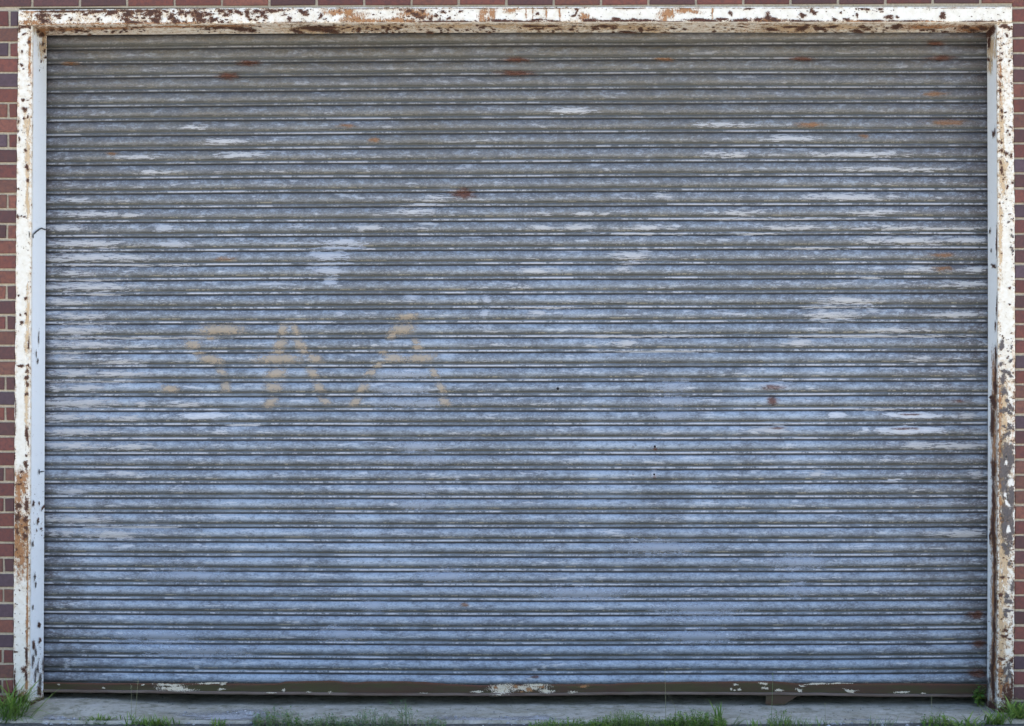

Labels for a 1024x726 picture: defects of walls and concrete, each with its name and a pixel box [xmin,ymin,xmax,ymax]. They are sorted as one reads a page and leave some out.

peeling [17,8,1014,289]
corrosion [271,8,1009,272]
peeling [14,197,235,587]
peeling [507,306,584,315]
peeling [780,296,986,347]
corrosion [14,469,29,645]
peeling [828,332,1015,713]
peeling [472,661,558,696]
peeling [758,682,857,694]